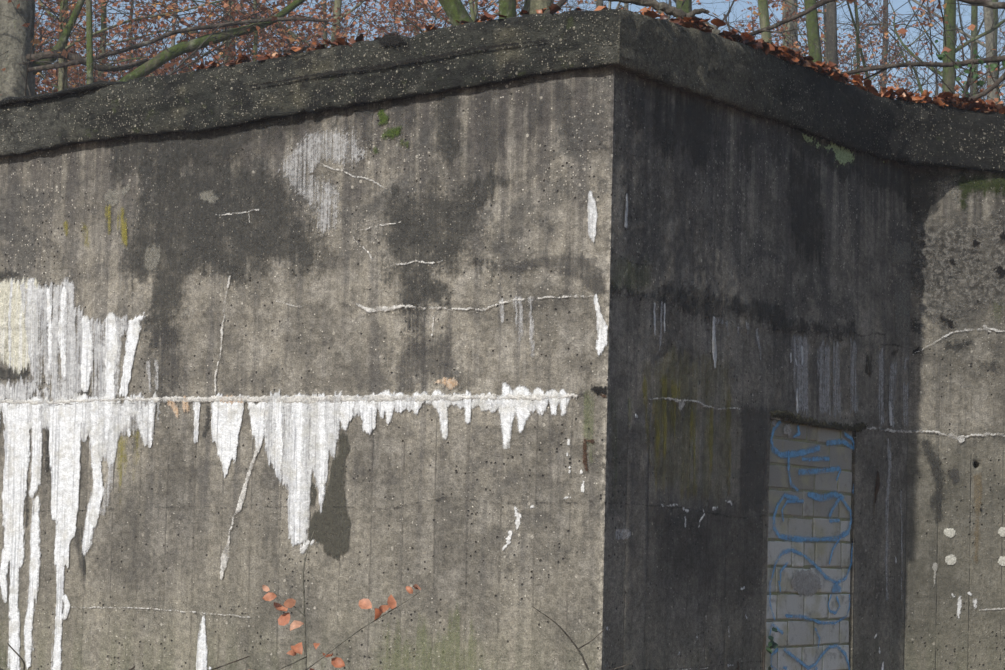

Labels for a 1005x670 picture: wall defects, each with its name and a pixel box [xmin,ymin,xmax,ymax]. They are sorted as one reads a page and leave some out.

damp [0,84,569,670]
damp [771,126,960,269]